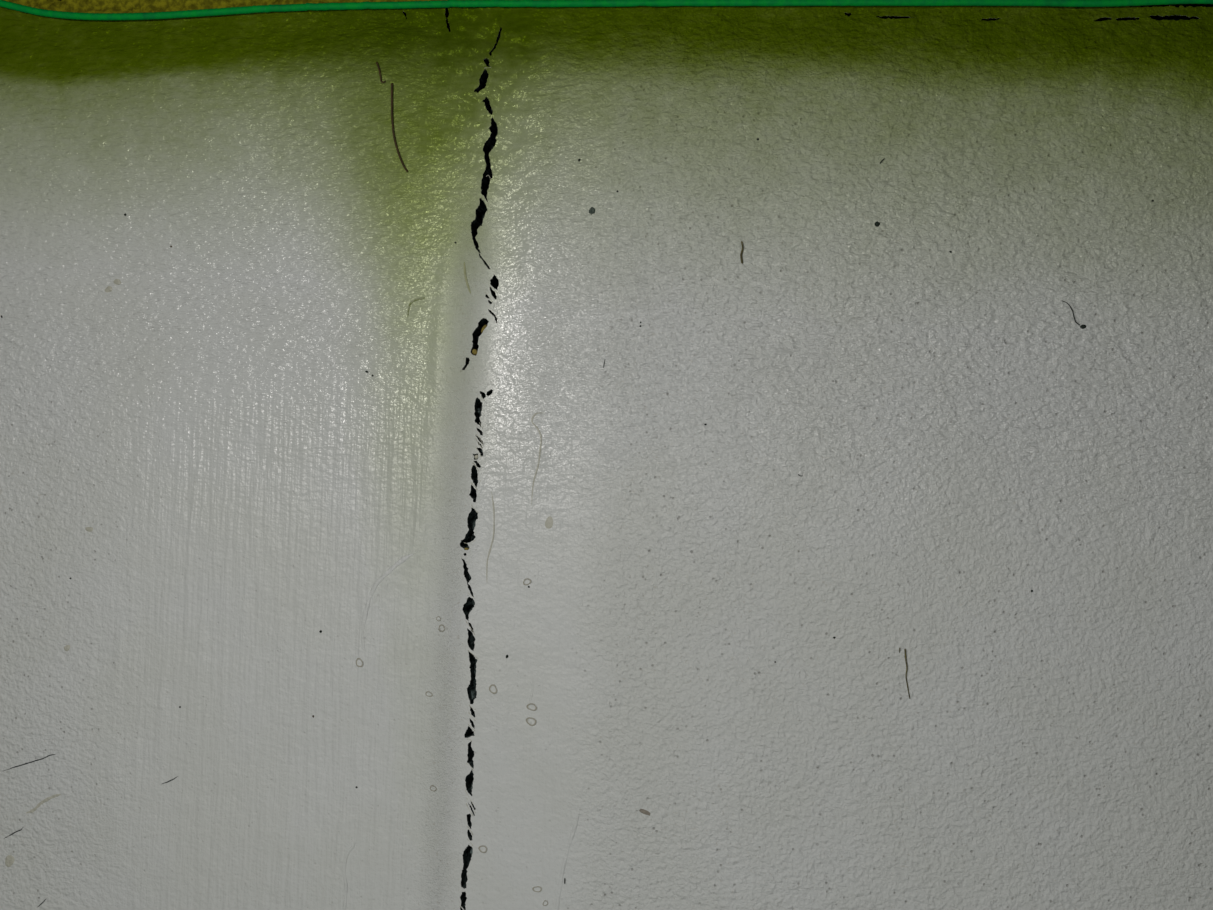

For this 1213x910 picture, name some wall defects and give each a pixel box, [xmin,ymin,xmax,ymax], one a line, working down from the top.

crack [460,27,502,910]
damp [0,5,1213,97]